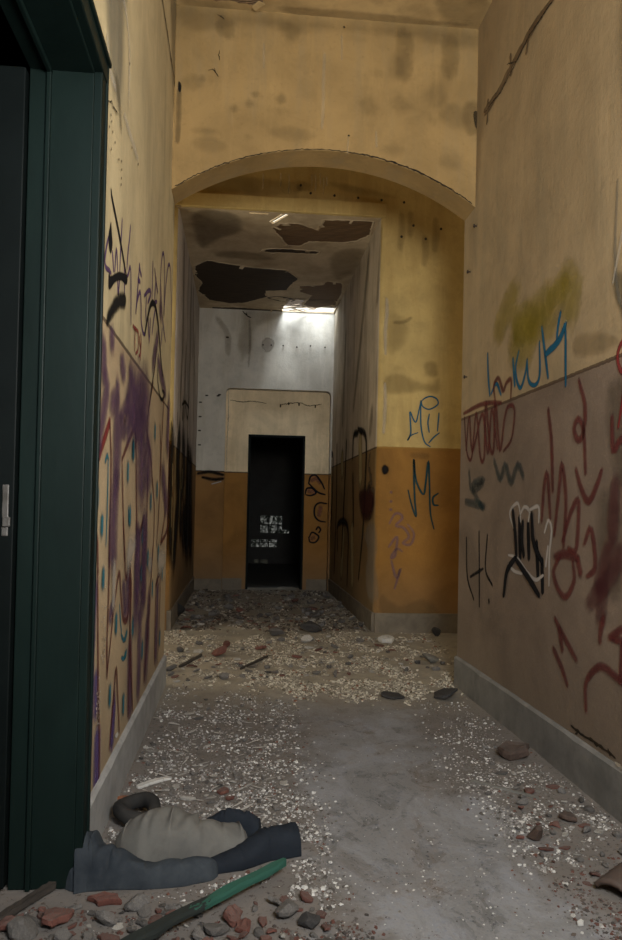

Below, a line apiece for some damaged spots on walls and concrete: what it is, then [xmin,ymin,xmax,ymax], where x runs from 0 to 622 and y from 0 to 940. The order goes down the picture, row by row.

peeling [260,219,375,255]
peeling [192,260,346,312]